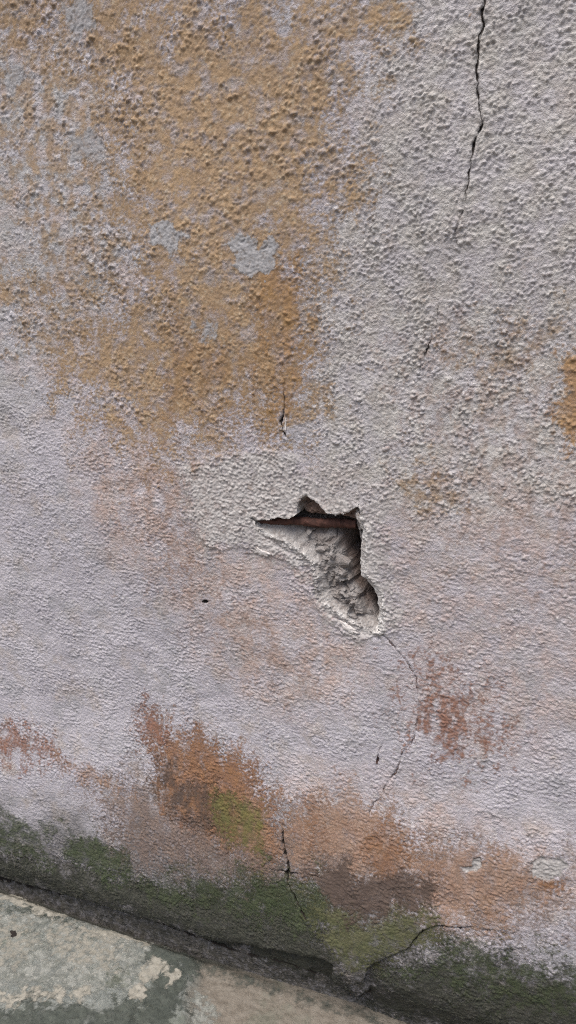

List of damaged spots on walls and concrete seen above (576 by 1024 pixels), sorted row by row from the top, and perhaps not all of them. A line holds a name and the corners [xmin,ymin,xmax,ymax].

crack [455,0,486,241]
peeling [177,449,403,646]
crack [369,641,419,812]
crack [274,825,318,919]
water stain [81,758,573,932]